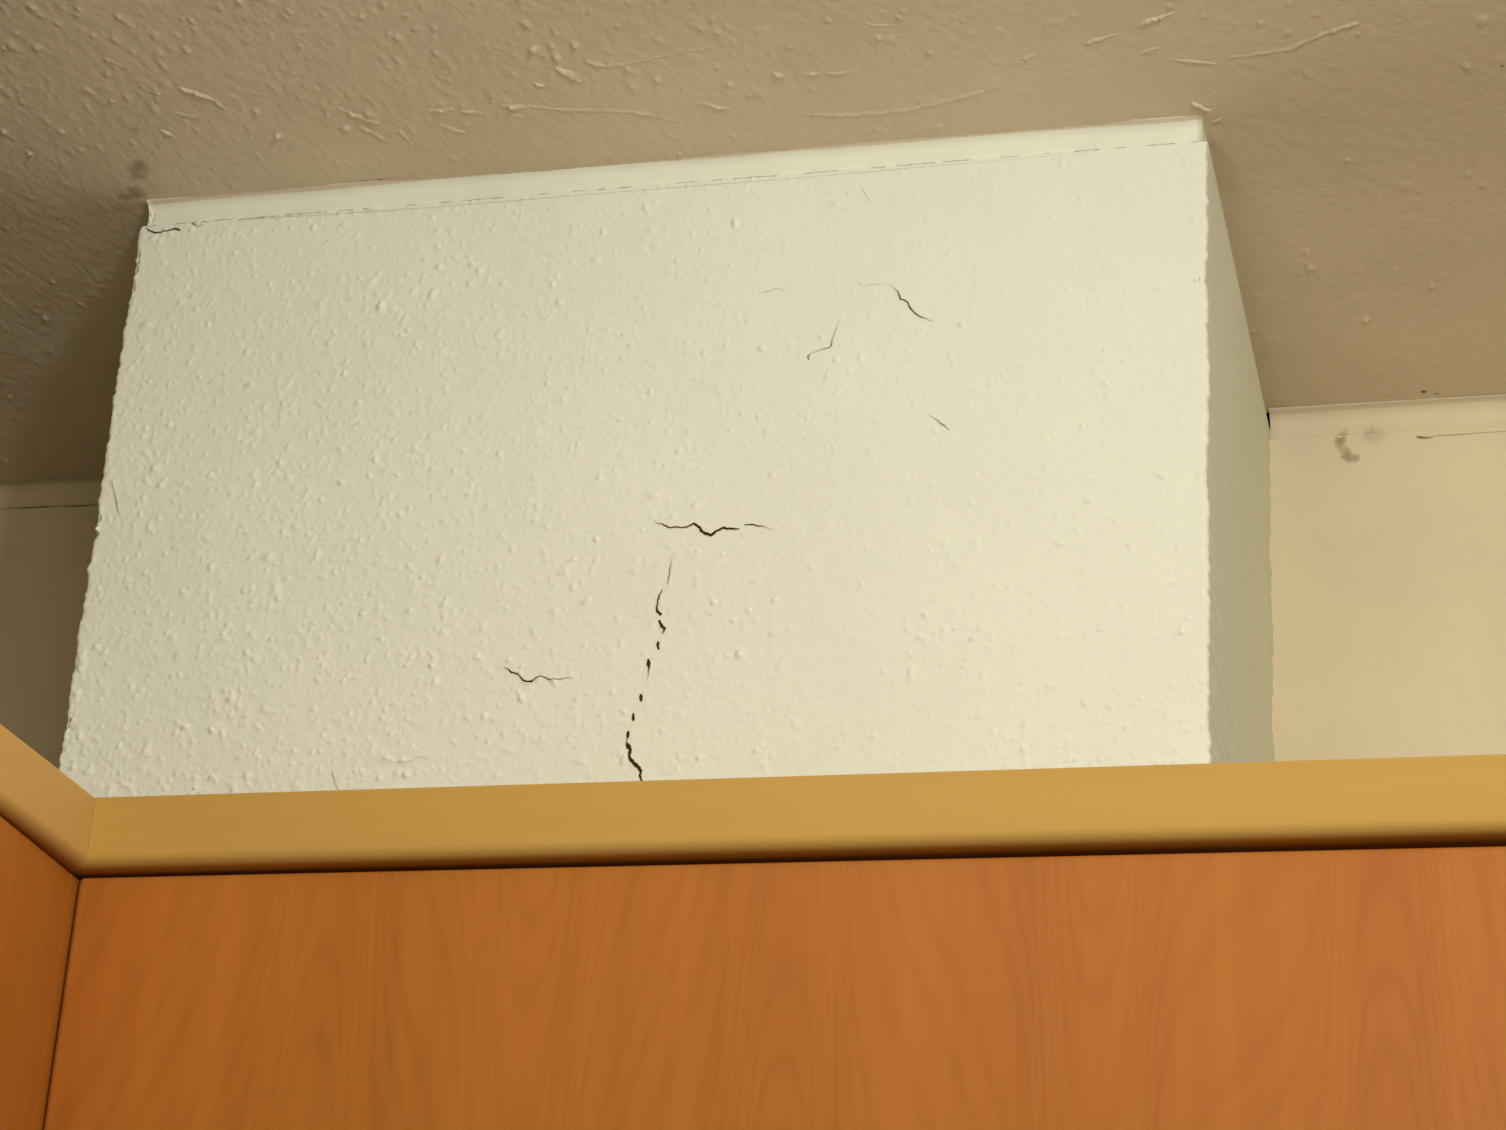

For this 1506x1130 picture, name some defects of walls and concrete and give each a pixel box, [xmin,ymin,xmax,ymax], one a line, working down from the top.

crack [889,287,930,323]
crack [626,522,766,781]
crack [505,668,569,685]